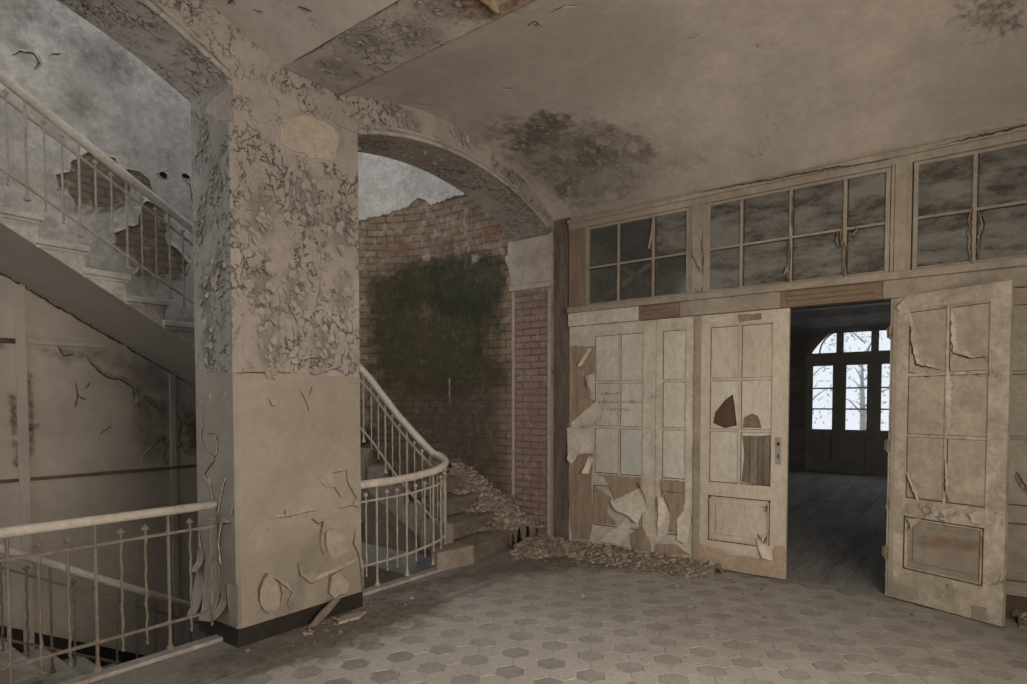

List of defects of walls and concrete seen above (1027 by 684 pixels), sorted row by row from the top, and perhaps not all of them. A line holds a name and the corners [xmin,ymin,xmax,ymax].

leakage [510,115,675,198]
crack [74,382,90,410]
crack [0,271,196,387]
flaking render [52,147,227,365]
crack [140,412,233,564]
peeling [243,186,339,381]
peeling [567,346,786,578]